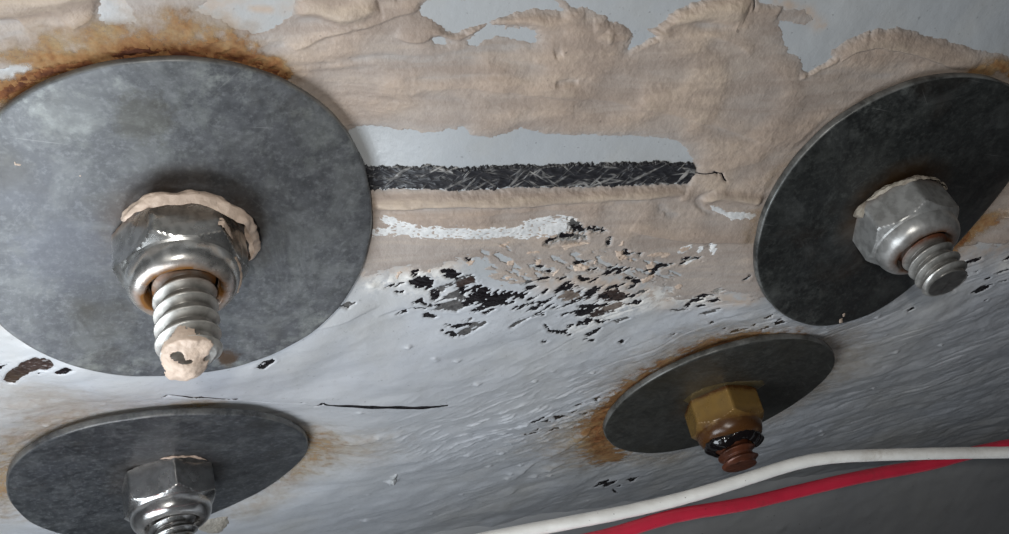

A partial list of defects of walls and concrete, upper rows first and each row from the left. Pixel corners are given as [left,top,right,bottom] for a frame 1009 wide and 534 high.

corrosion [0,10,294,105]
peeling [710,205,756,221]
peeling [371,215,718,343]
peeling [965,256,1009,301]
peeling [671,288,785,333]
peeling [0,357,72,383]
crack [164,393,238,401]
crack [302,401,448,409]
peeling [524,396,601,435]
corrosion [568,328,807,465]
peeling [595,476,639,493]